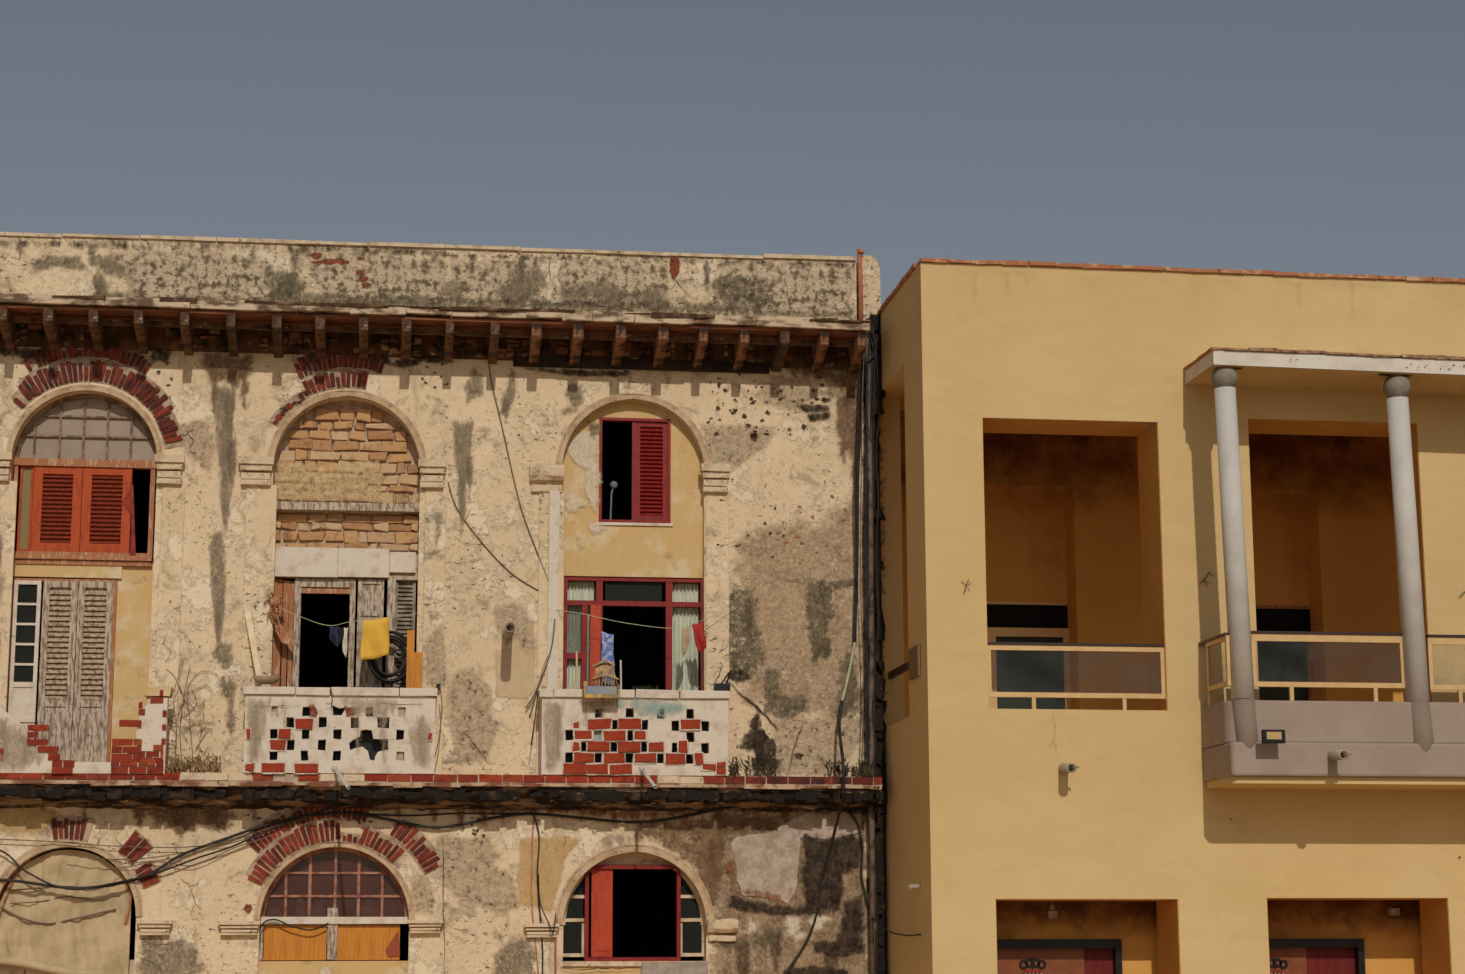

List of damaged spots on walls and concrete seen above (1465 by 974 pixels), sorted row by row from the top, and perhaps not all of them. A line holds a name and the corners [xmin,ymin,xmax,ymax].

damp [16,243,128,293]
damp [250,251,306,301]
spalling [11,342,214,468]
spalling [269,349,385,426]
damp [203,352,266,762]
damp [790,365,887,755]
damp [729,588,808,718]
flaking render [27,725,75,774]
flaking render [111,690,167,773]
spalling [562,717,727,775]
spalling [244,806,517,915]
damp [421,806,870,974]